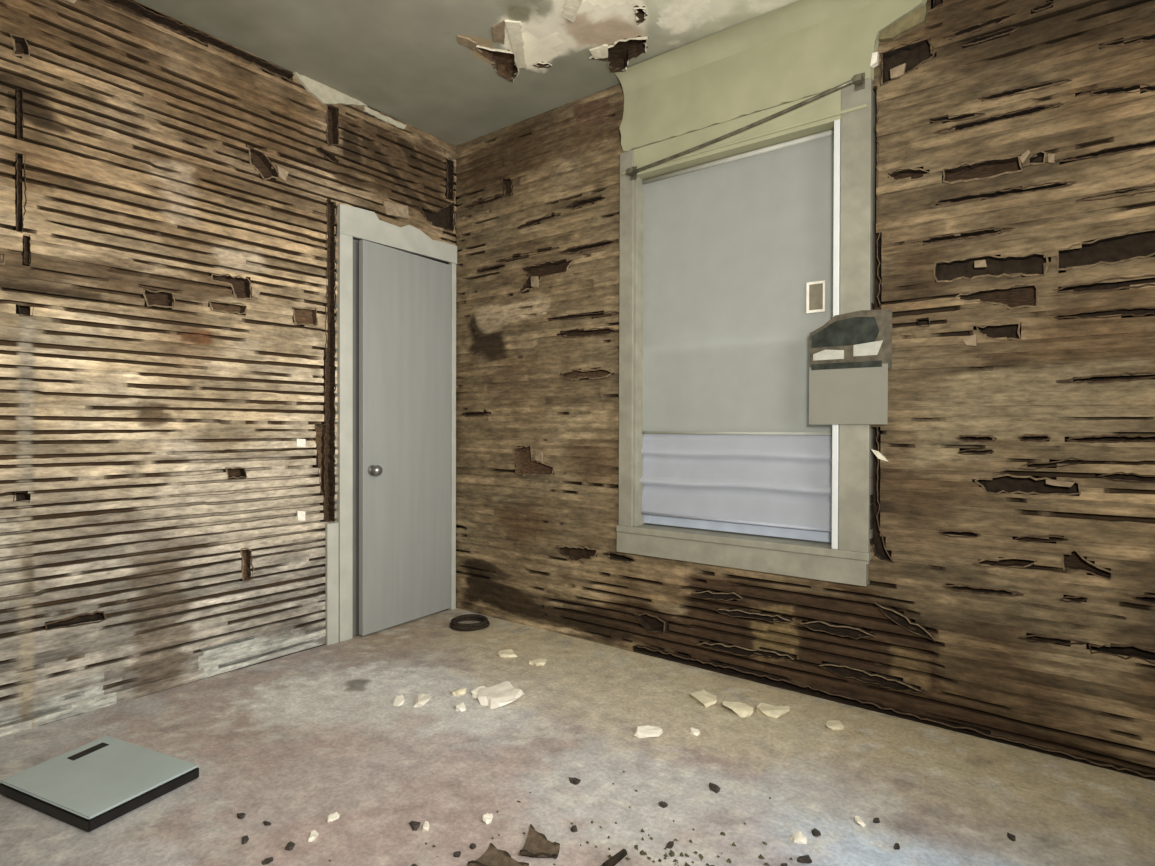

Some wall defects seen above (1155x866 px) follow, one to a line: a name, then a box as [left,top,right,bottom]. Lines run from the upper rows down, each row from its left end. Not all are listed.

damp [472,0,566,39]
peeling [486,17,608,79]
peeling [561,0,728,53]
spalling [870,36,935,86]
peeling [363,106,407,130]
peeling [276,166,289,182]